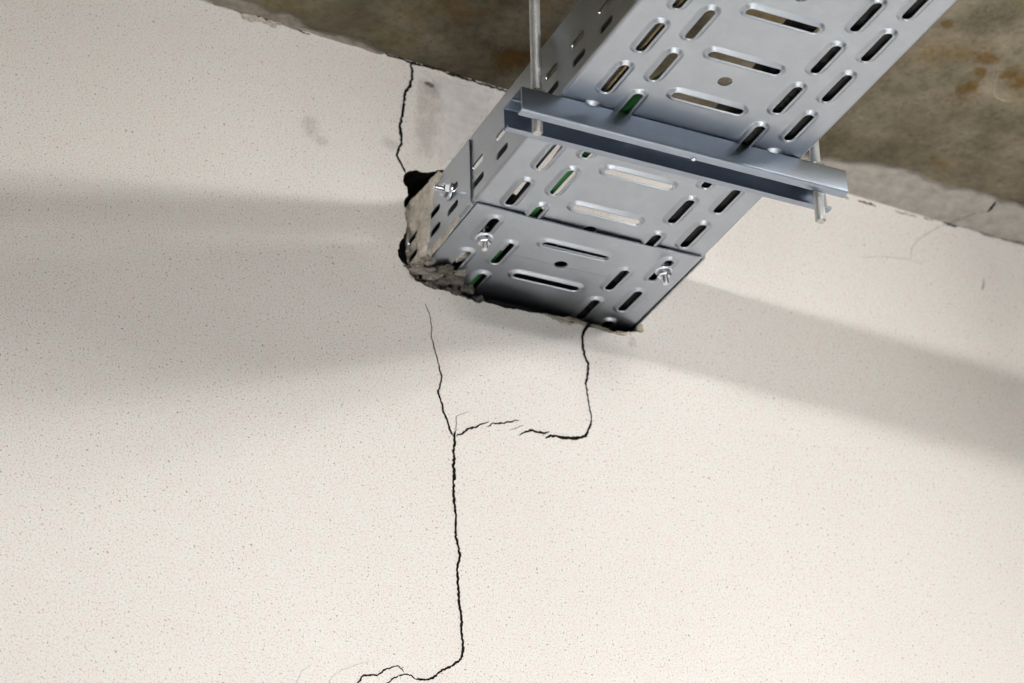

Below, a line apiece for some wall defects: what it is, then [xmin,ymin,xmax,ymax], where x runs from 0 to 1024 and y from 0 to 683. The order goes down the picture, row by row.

crack [383,53,508,173]
spalling [403,170,444,208]
spalling [401,233,486,303]
spalling [493,243,514,263]
spalling [513,274,578,290]
spalling [543,242,607,267]
spalling [540,313,644,336]
crack [296,303,592,683]